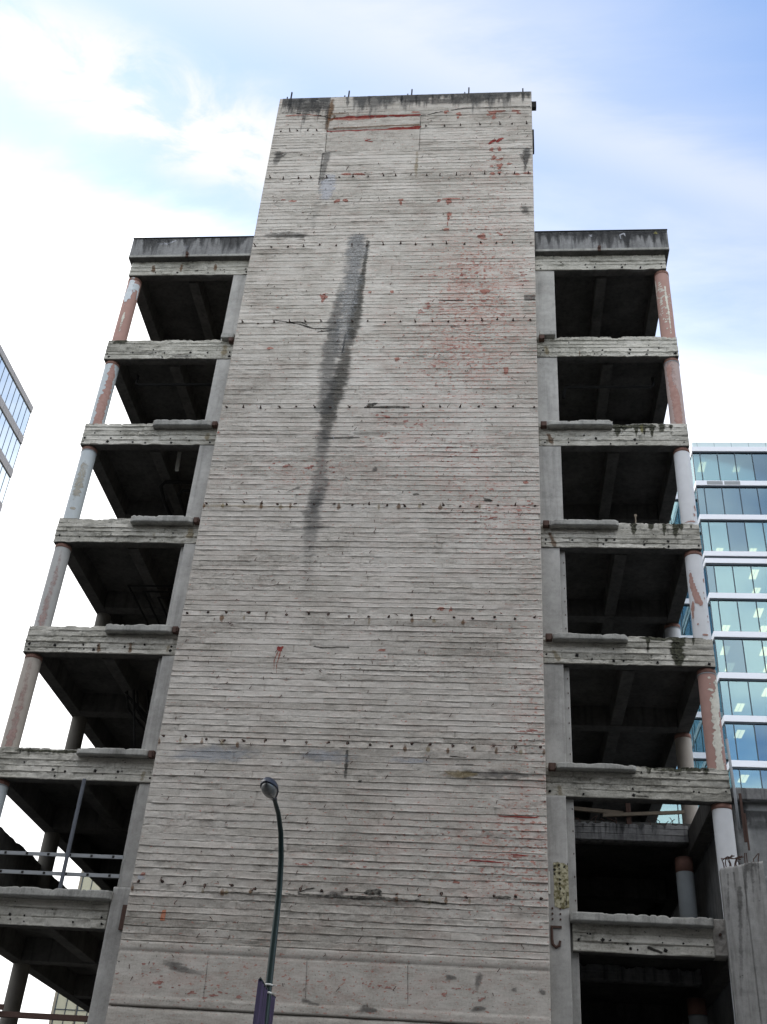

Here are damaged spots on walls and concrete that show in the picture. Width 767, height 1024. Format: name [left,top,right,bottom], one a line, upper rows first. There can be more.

damp [282,97,330,119]
damp [538,231,666,247]
damp [320,234,369,434]
peeling [92,364,115,424]
peeling [666,365,683,424]
peeling [70,463,85,509]
damp [648,523,692,536]
peeling [689,573,708,636]